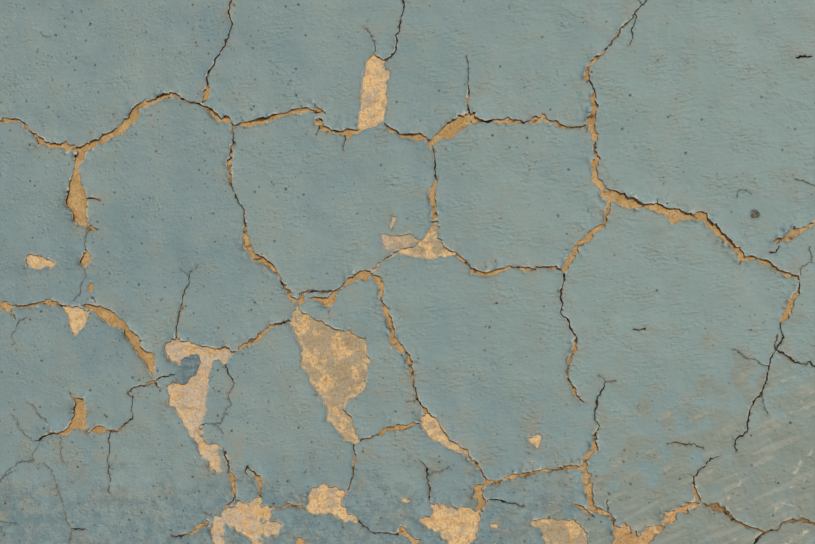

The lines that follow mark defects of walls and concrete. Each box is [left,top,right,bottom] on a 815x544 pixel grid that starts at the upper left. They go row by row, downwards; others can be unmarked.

peeling [355,29,390,130]
peeling [63,147,238,476]
crack [0,0,430,490]
peeling [372,143,459,272]
crack [383,0,815,544]
peeling [289,289,371,445]
crack [0,439,85,541]
crack [172,451,306,537]
peeling [208,497,286,544]
peeling [303,484,359,525]
crack [359,521,420,544]
peeling [400,495,499,544]